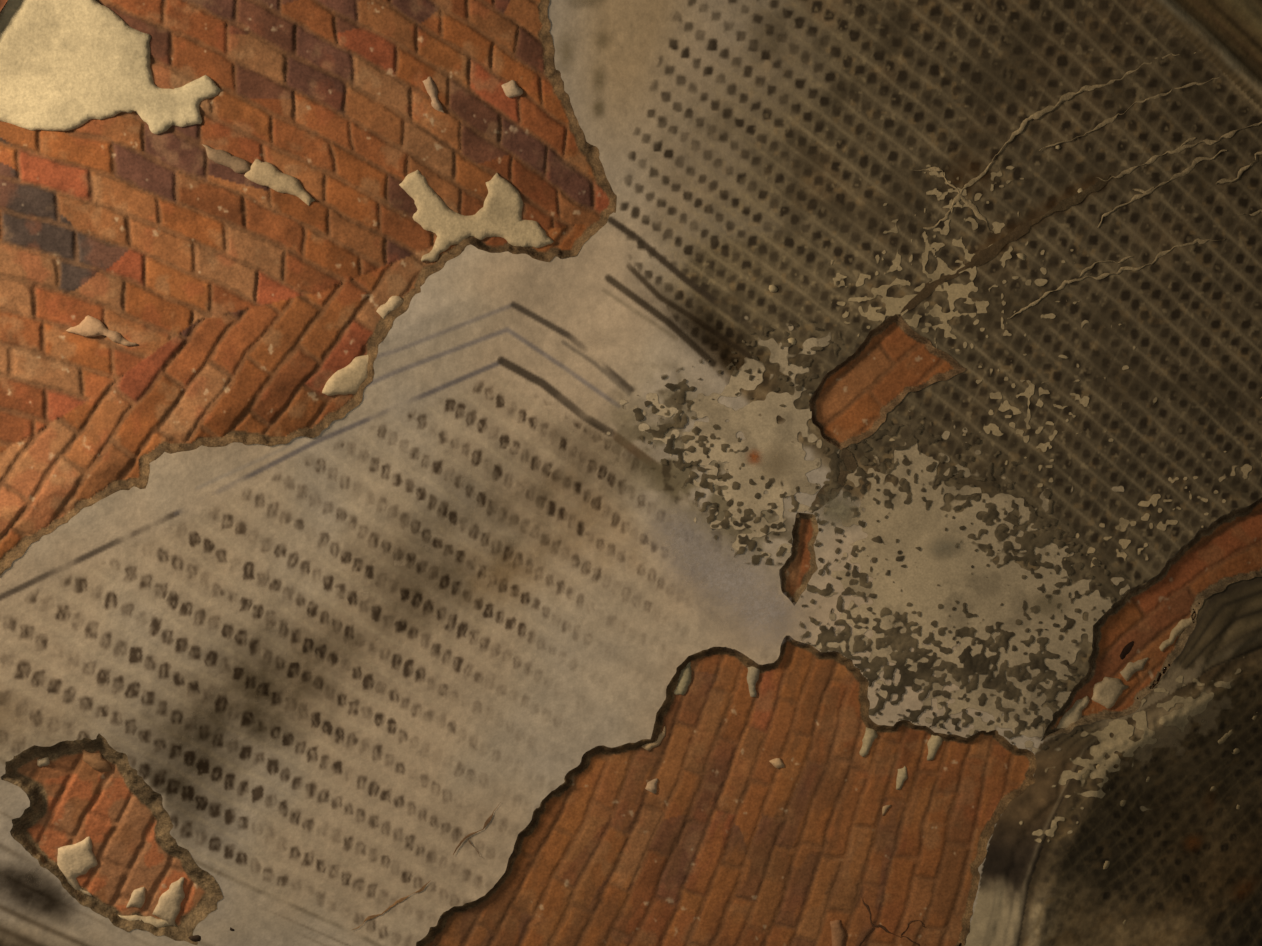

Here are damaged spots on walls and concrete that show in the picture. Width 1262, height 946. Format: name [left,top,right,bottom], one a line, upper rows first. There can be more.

spalling [0,0,617,576]
crack [896,50,1262,319]
spalling [416,165,1262,946]
leakage [0,870,62,912]
spalling [1,734,223,945]